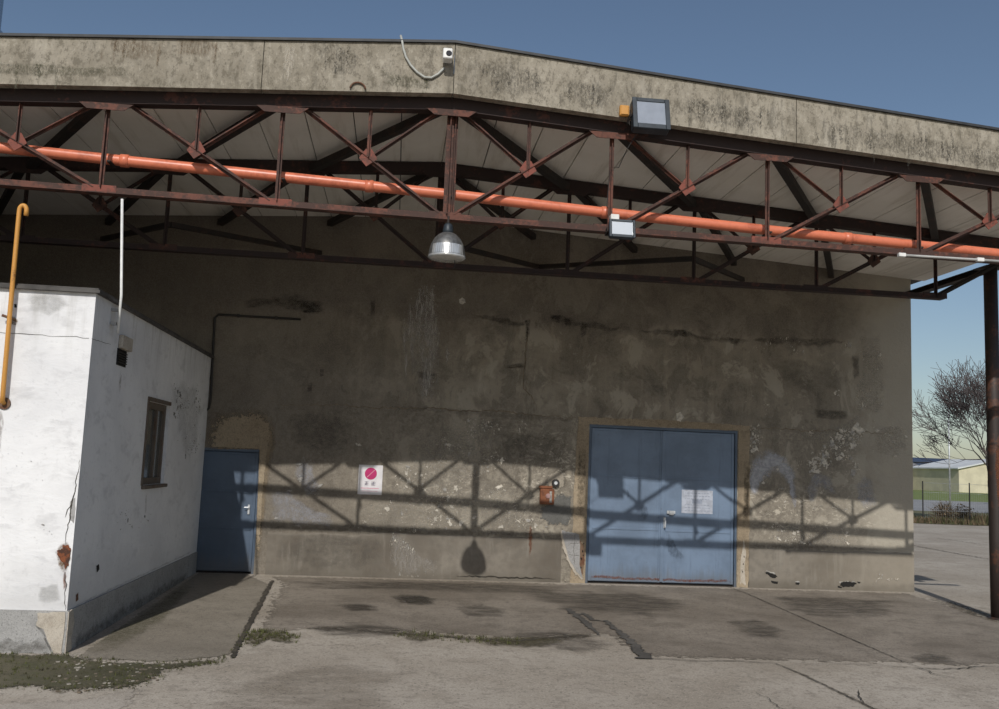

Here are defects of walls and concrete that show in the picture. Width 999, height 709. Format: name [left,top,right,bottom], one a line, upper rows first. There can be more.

flaking render [173,383,271,555]
flaking render [797,423,865,477]
crack [65,469,79,543]
flaking render [481,485,549,533]
spalling [561,530,585,581]